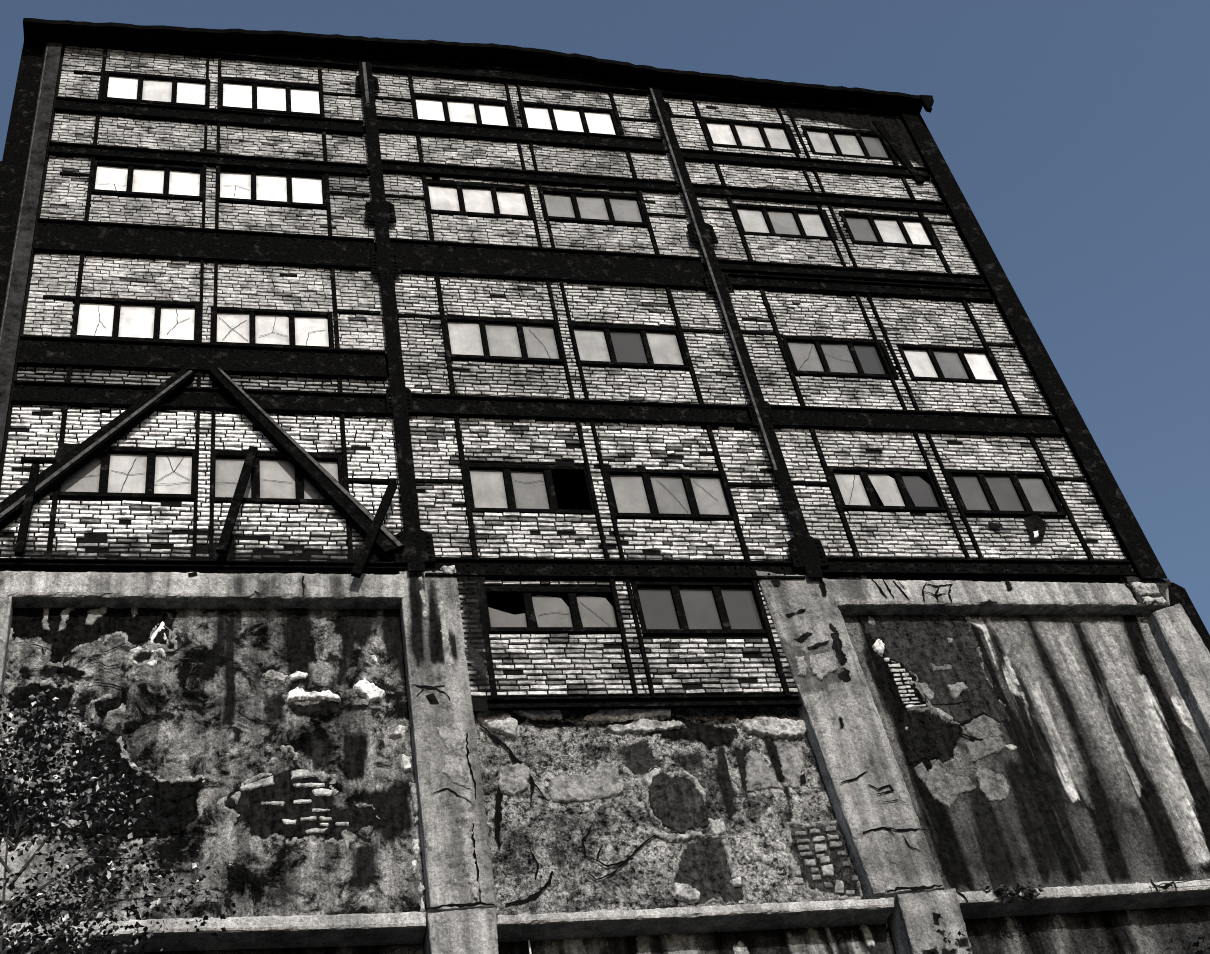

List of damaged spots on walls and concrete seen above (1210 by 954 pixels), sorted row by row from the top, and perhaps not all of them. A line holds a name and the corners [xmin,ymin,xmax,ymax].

flaking render [0,607,385,854]
peeling [389,721,482,912]
crack [426,850,553,910]
crack [480,724,549,848]
crack [581,825,656,880]
flaking render [476,709,827,906]
spalling [793,623,851,681]
flaking render [784,820,863,901]
damp [857,615,974,890]
flaking render [860,614,1017,810]
damp [965,615,1131,888]
damp [1073,615,1210,877]